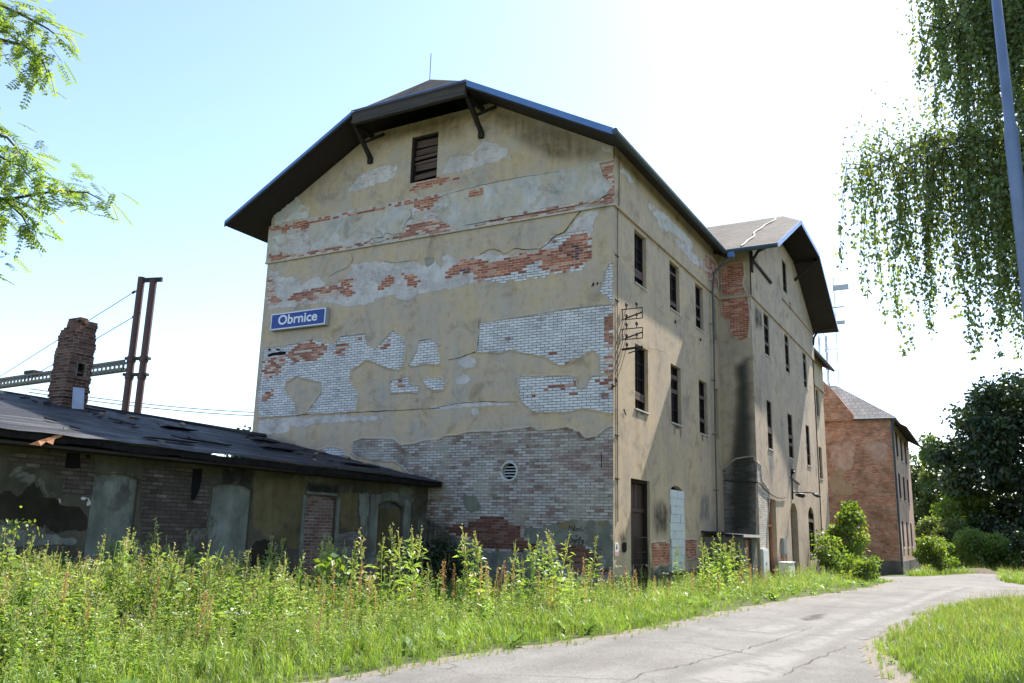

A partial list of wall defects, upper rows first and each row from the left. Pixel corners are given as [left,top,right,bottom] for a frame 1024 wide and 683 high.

flaking render [266,139,634,310]
crack [465,193,610,254]
flaking render [646,202,751,342]
water stain [0,482,88,533]
flaking render [256,261,627,588]
water stain [732,362,750,528]